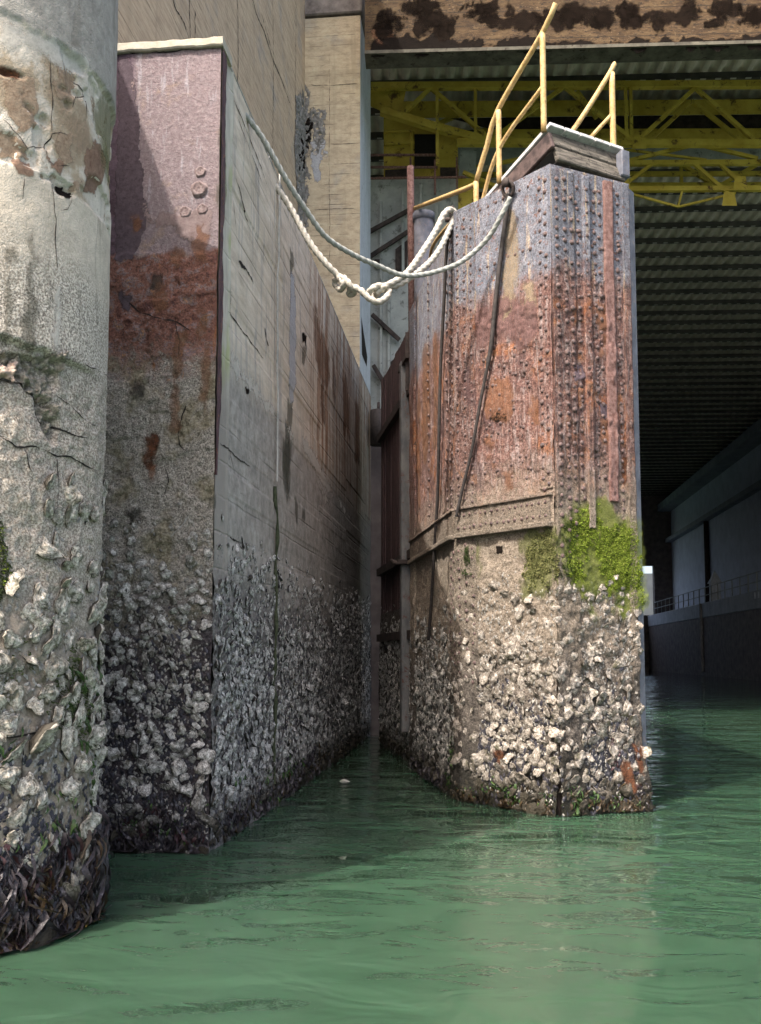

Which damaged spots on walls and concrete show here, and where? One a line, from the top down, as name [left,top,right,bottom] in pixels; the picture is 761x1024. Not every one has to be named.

flaking render [0,67,39,176]
peeling [46,58,213,262]
spalling [294,85,327,230]
corrosion [485,377,513,422]
crack [0,397,96,530]
corrosion [142,433,160,479]
corrosion [622,745,643,793]